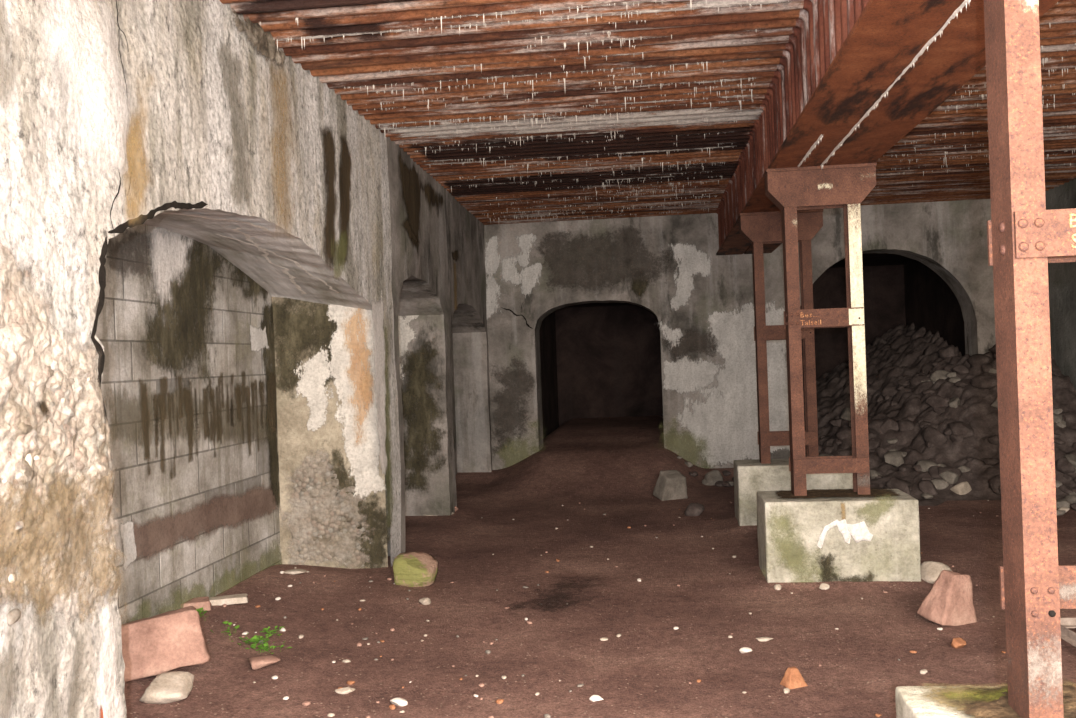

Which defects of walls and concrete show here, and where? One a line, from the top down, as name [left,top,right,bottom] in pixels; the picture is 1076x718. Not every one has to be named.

water stain [220,48,248,200]
water stain [237,0,789,291]
water stain [798,134,823,167]
water stain [820,0,971,169]
water stain [109,305,280,559]
flaking render [280,293,387,611]
flaking render [398,315,419,380]
flaking render [485,233,542,319]
water stain [494,358,535,452]
water stain [817,519,874,582]